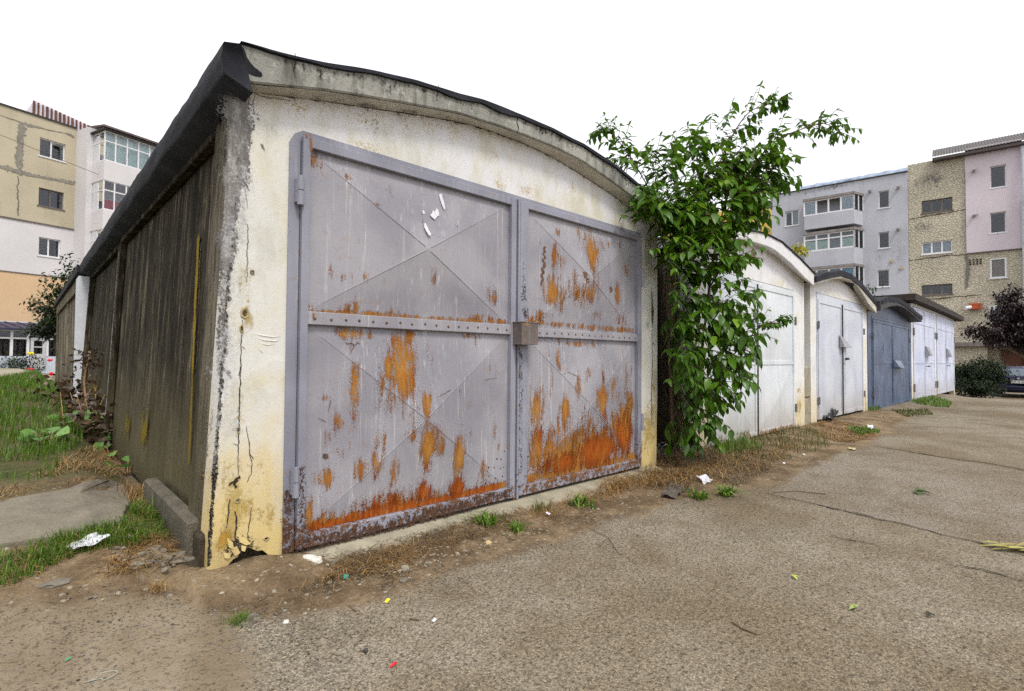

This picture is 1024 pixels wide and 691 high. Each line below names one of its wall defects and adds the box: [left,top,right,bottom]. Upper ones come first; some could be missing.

corrosion [280,290,513,554]